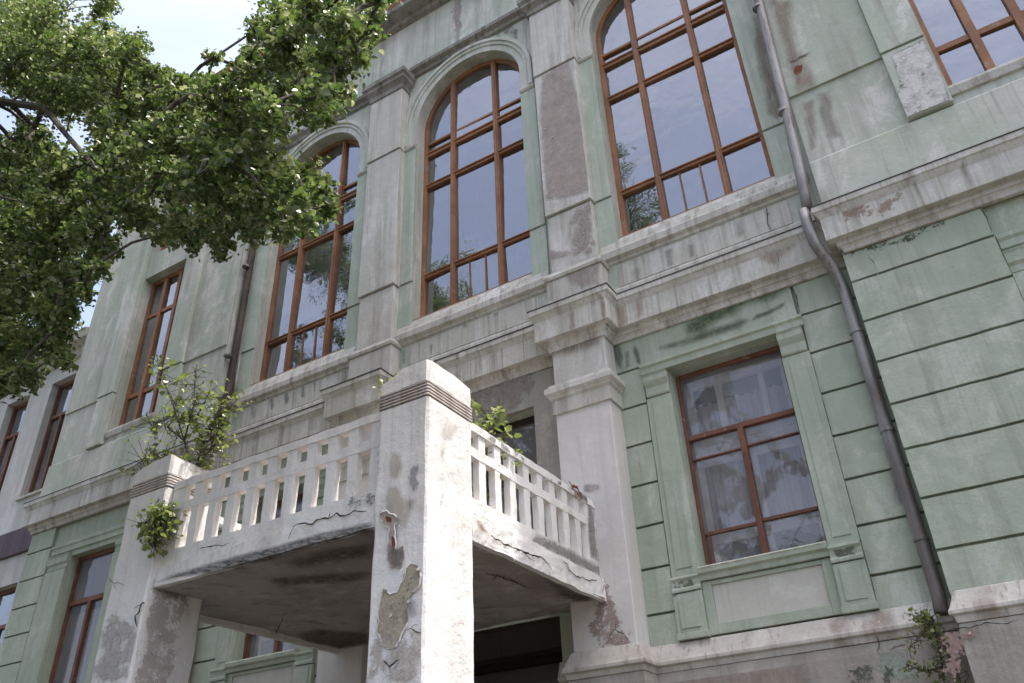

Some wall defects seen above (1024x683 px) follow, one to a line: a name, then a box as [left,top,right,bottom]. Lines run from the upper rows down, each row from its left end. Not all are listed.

mould [669,291,778,346]
crack [288,510,366,539]
flaking render [89,489,422,683]
crack [491,535,604,590]
peeling [558,581,630,648]